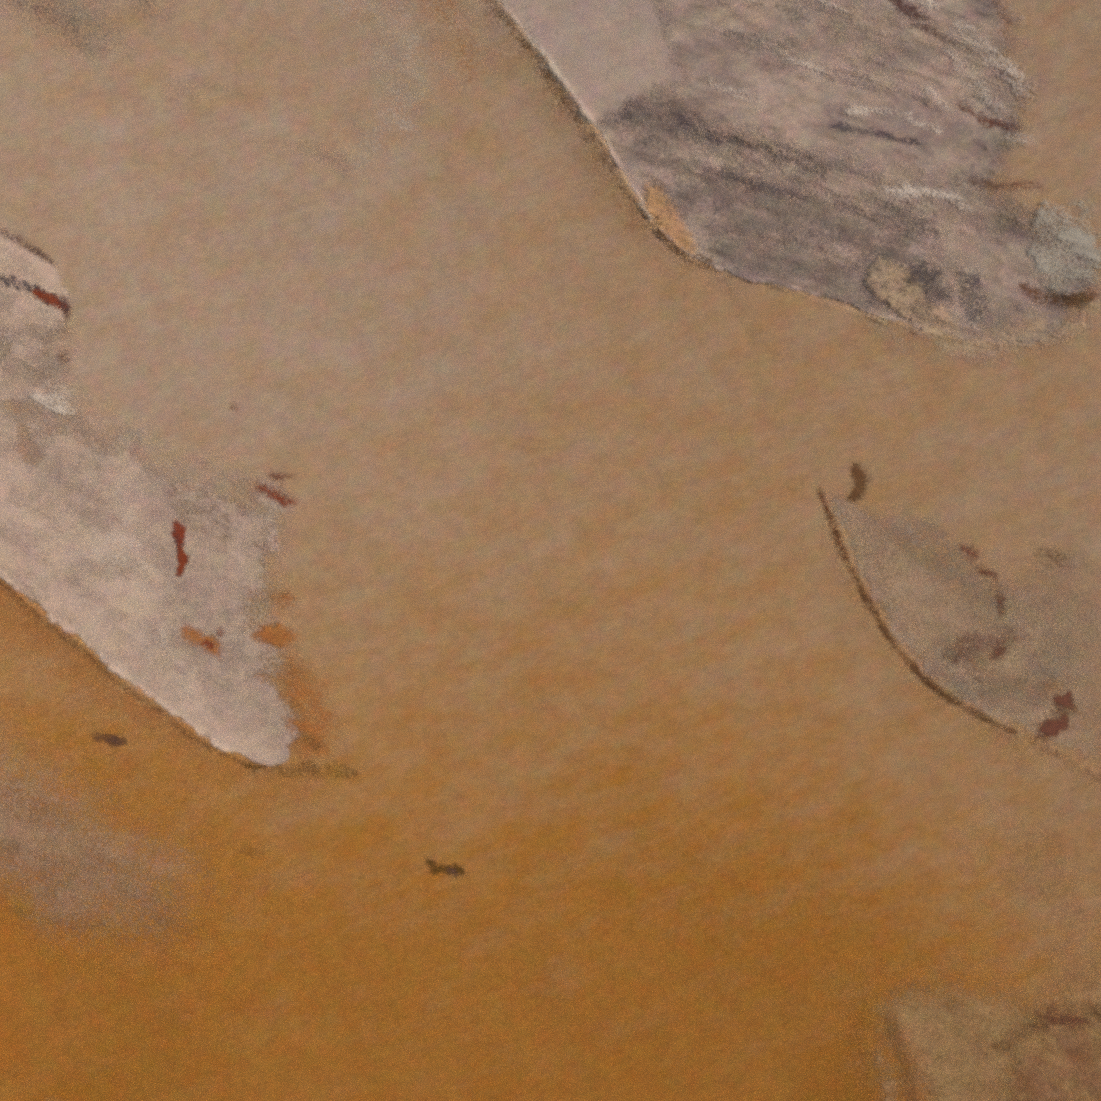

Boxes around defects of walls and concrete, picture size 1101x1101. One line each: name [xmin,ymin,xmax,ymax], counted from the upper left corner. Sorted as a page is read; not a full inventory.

spalling [482,0,1101,368]
spalling [0,232,360,802]
corrosion [171,520,190,577]
corrosion [255,472,296,508]
peeling [828,461,1101,763]